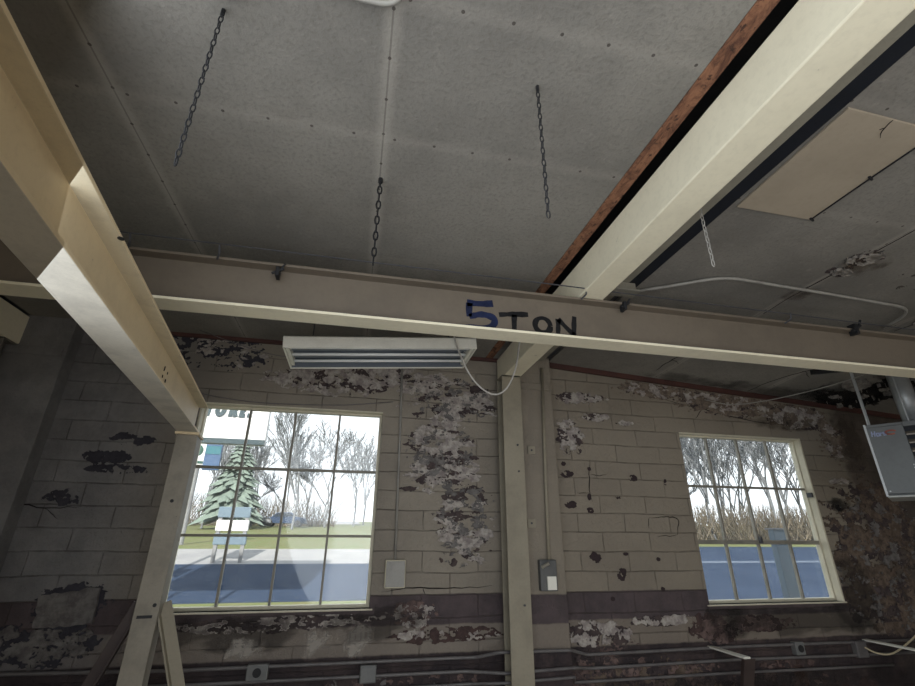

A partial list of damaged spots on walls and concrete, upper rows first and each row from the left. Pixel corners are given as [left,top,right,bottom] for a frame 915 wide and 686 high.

peeling [82,432,160,474]
peeling [173,336,499,568]
peeling [41,488,86,506]
peeling [564,493,594,513]
spalling [818,466,915,639]
spalling [0,581,115,672]
peeling [176,599,504,645]
flaking render [569,612,797,686]